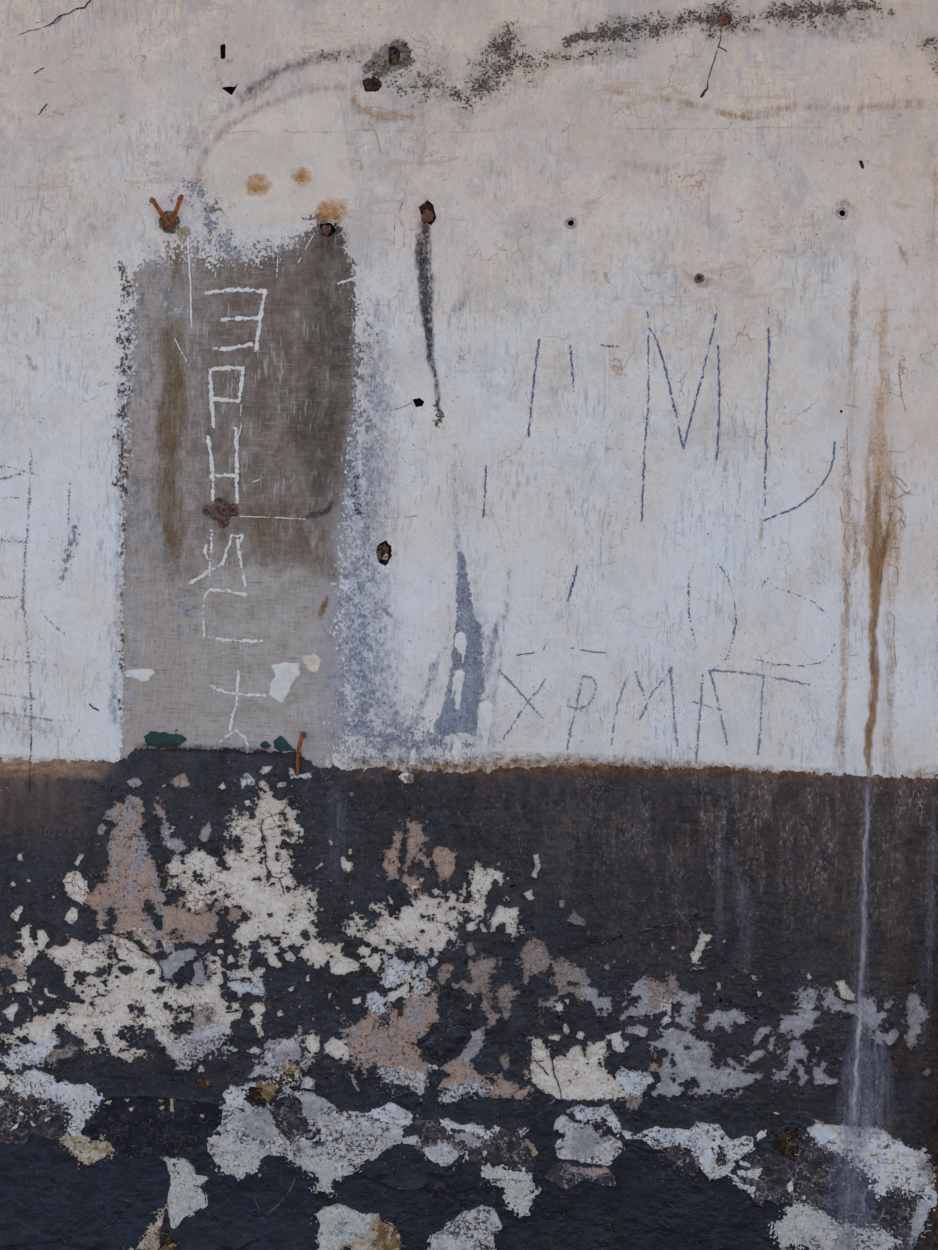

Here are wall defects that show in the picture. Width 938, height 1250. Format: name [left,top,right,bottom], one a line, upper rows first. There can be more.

corrosion [837,375,896,776]
peeling [0,766,938,1250]
damp [838,783,884,1135]